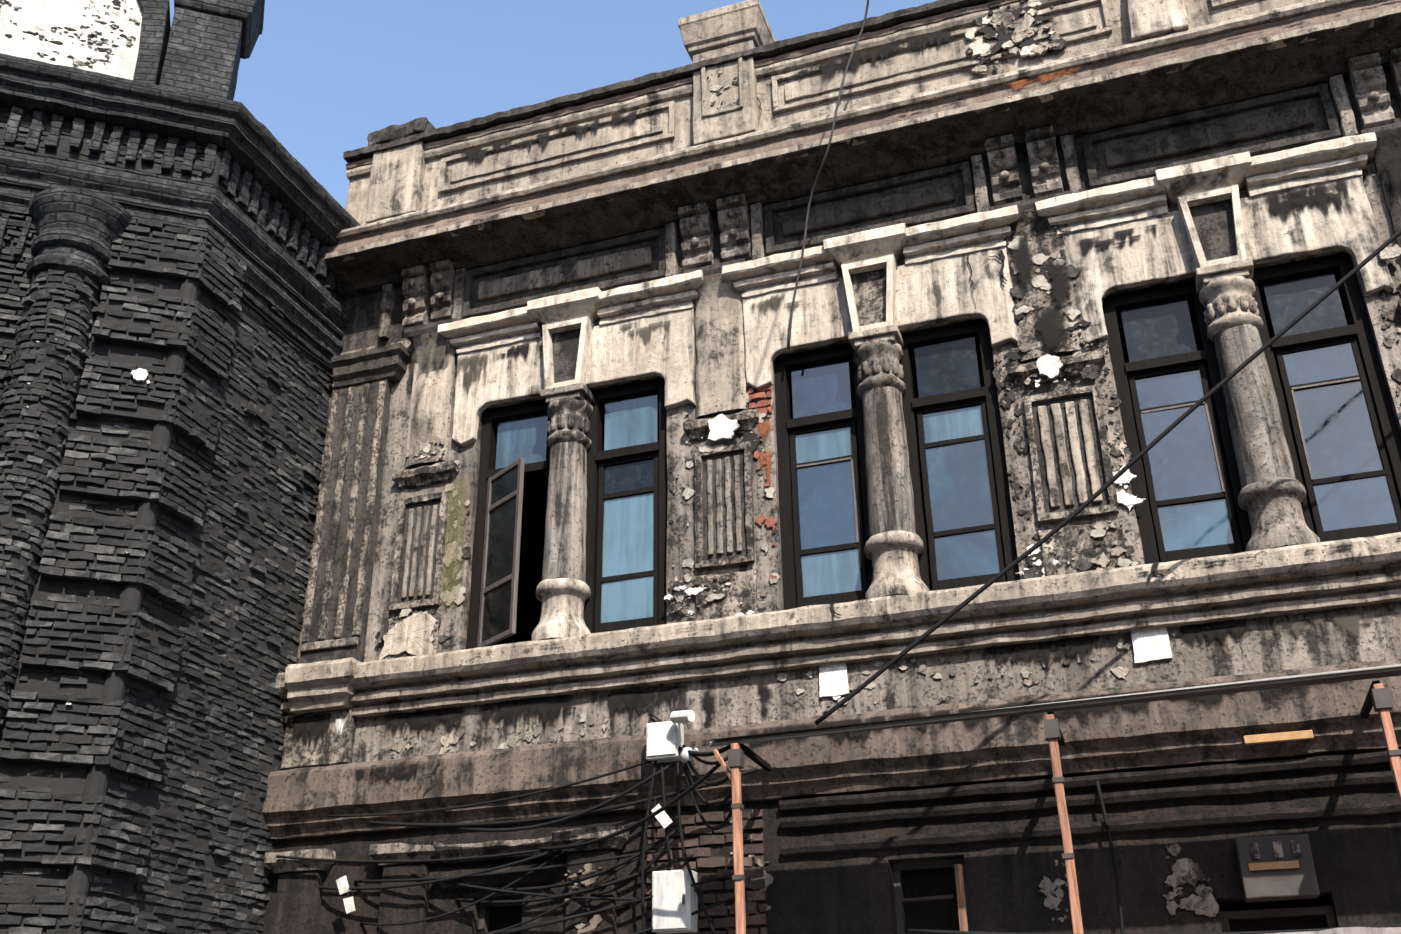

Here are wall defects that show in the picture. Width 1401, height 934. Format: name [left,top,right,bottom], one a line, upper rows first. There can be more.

spalling [0,0,140,67]
spalling [965,0,1067,74]
leakage [462,107,651,162]
spalling [992,224,1110,454]
corrosion [759,420,771,480]
peeling [1008,393,1146,579]
peeling [375,460,471,660]
peeling [664,558,781,617]
leakage [386,707,463,736]
leakage [480,694,576,730]
leakage [690,690,715,745]
leakage [355,763,425,782]